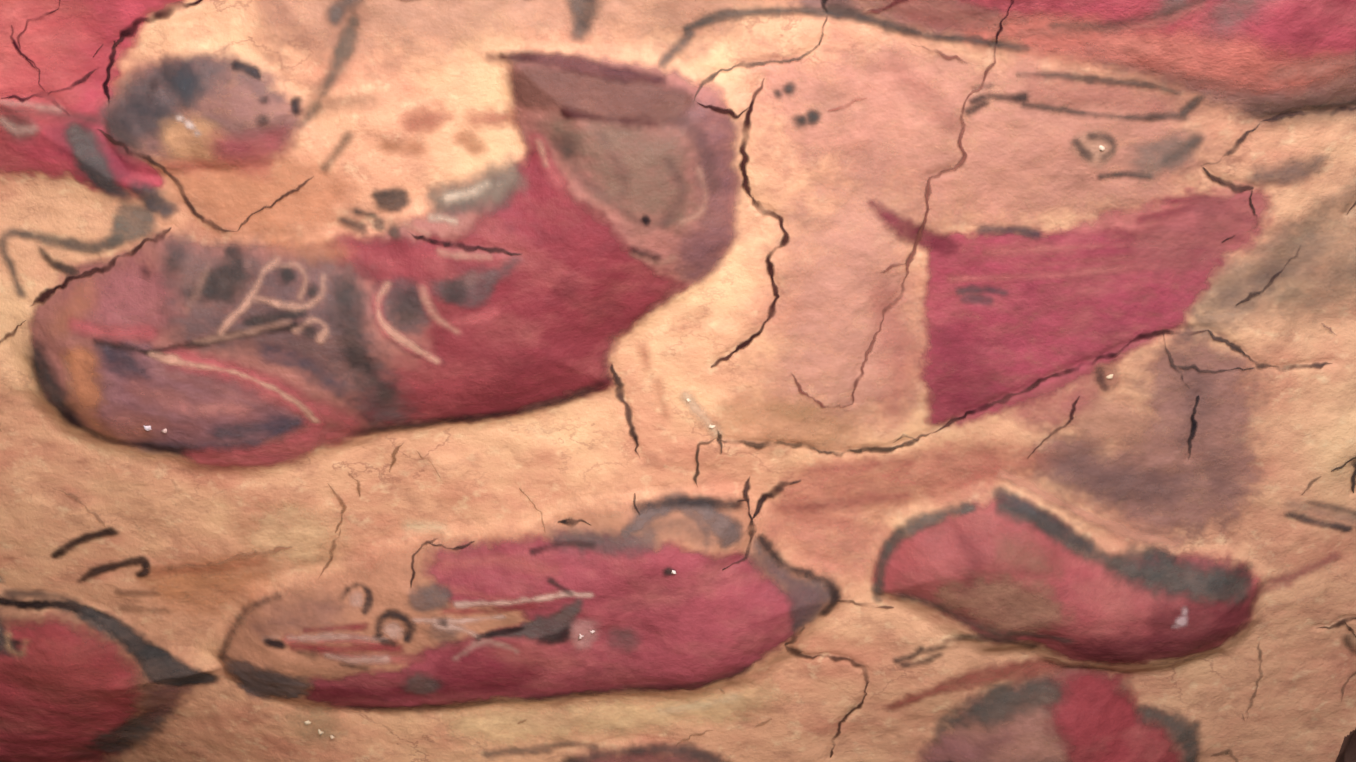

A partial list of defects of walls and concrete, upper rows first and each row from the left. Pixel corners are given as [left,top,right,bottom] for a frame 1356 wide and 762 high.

crack [869,0,906,13]
crack [0,0,311,343]
crack [695,0,827,368]
crack [881,2,1013,286]
crack [1236,257,1294,306]
crack [1203,106,1356,243]
crack [693,316,1337,570]
crack [1302,457,1356,495]